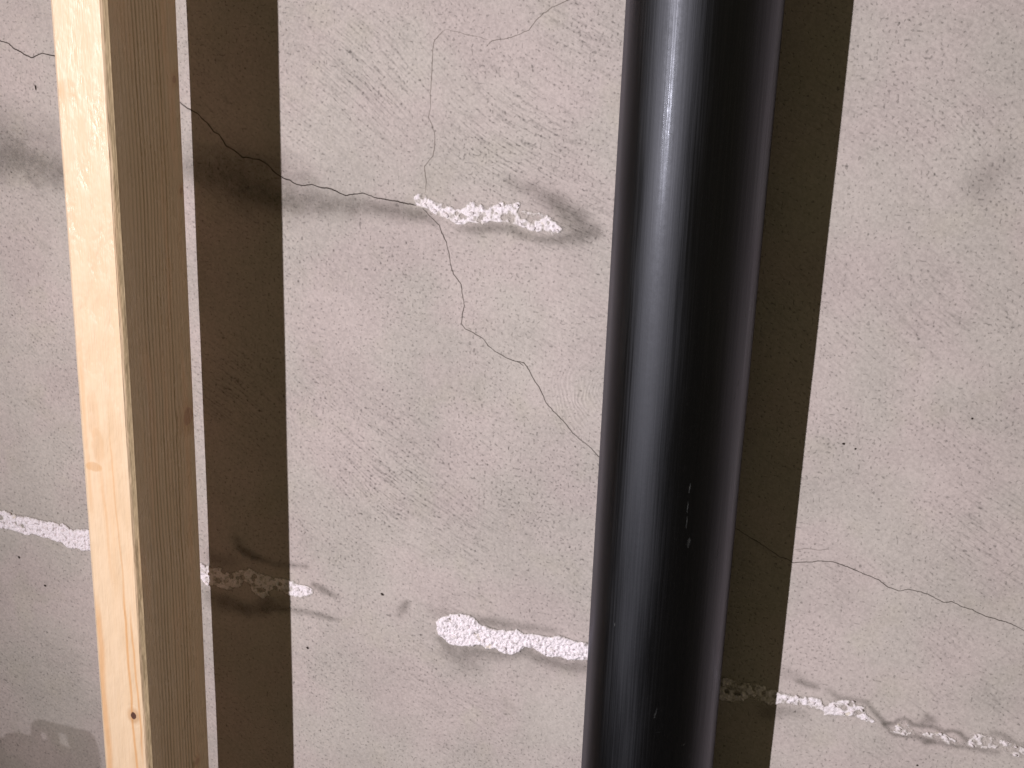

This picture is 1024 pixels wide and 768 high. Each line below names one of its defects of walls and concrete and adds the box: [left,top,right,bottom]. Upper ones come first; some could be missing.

crack [0,41,55,58]
crack [180,102,416,206]
water stain [413,193,562,235]
crack [438,224,572,432]
water stain [0,510,90,551]
water stain [200,563,314,599]
crack [735,528,1015,626]
water stain [435,613,588,661]
water stain [719,678,875,723]
water stain [891,724,1024,757]